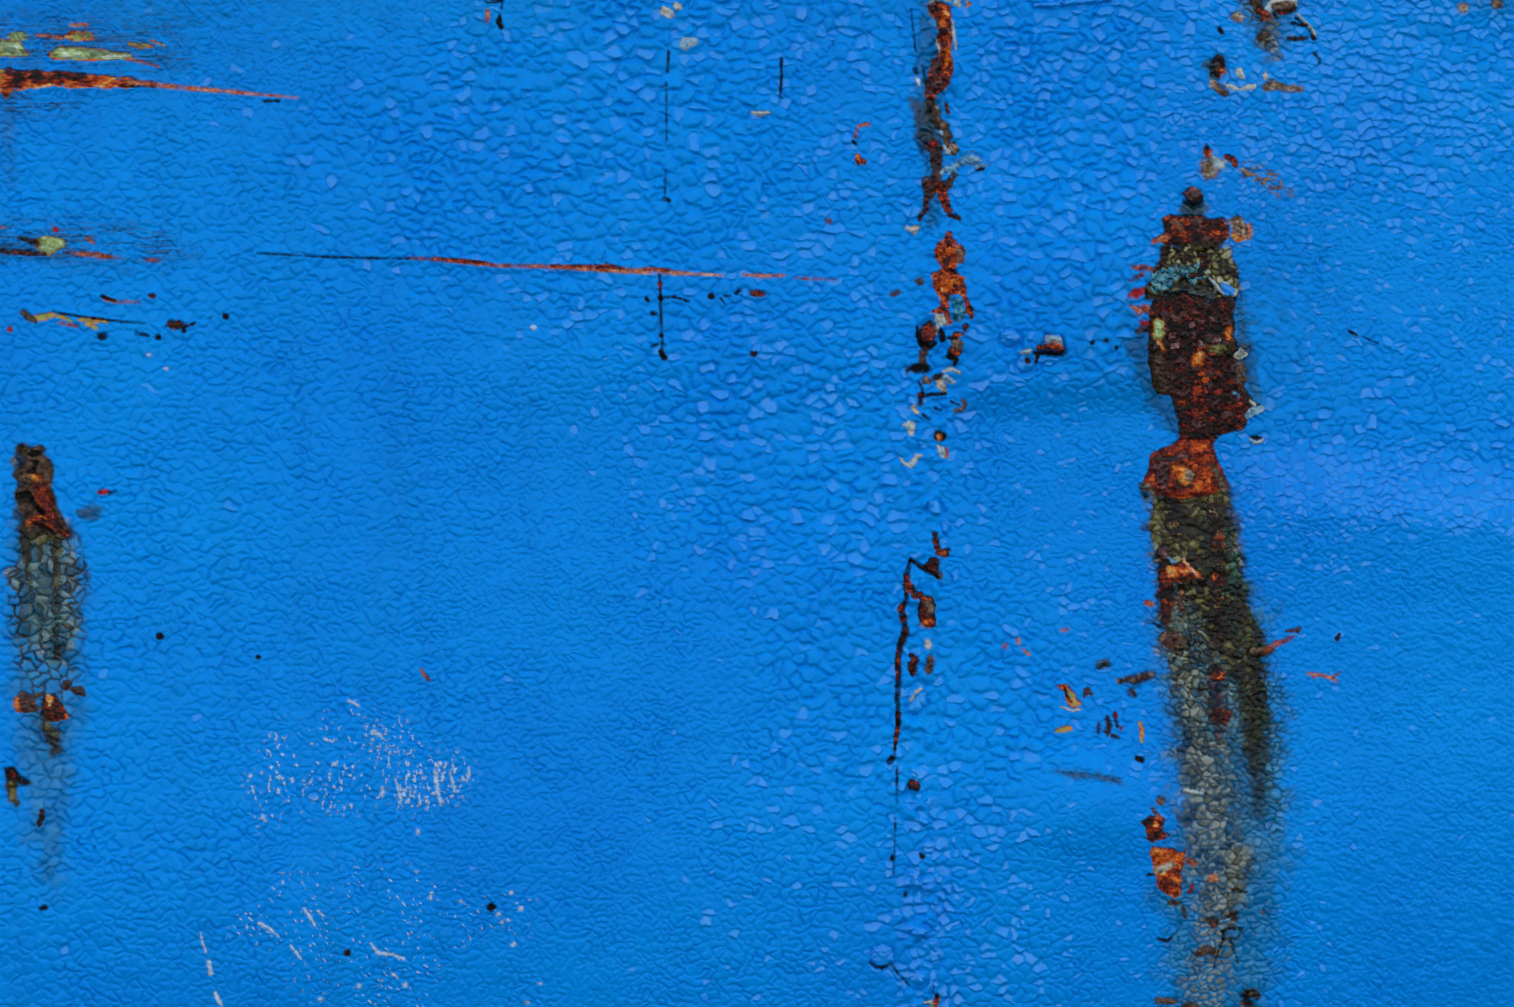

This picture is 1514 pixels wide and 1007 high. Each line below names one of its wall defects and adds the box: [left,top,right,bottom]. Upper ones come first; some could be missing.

rust [1240,0,1280,60]
rust [890,0,973,338]
rust [1145,215,1266,442]
rust [934,431,946,441]
rust [932,532,951,557]
rust [6,444,87,754]
rust [907,653,919,676]
rust [1149,490,1269,844]
rust [5,767,31,806]
rust [907,779,921,791]
rust [1141,796,1223,918]
rust [1241,988,1260,1007]